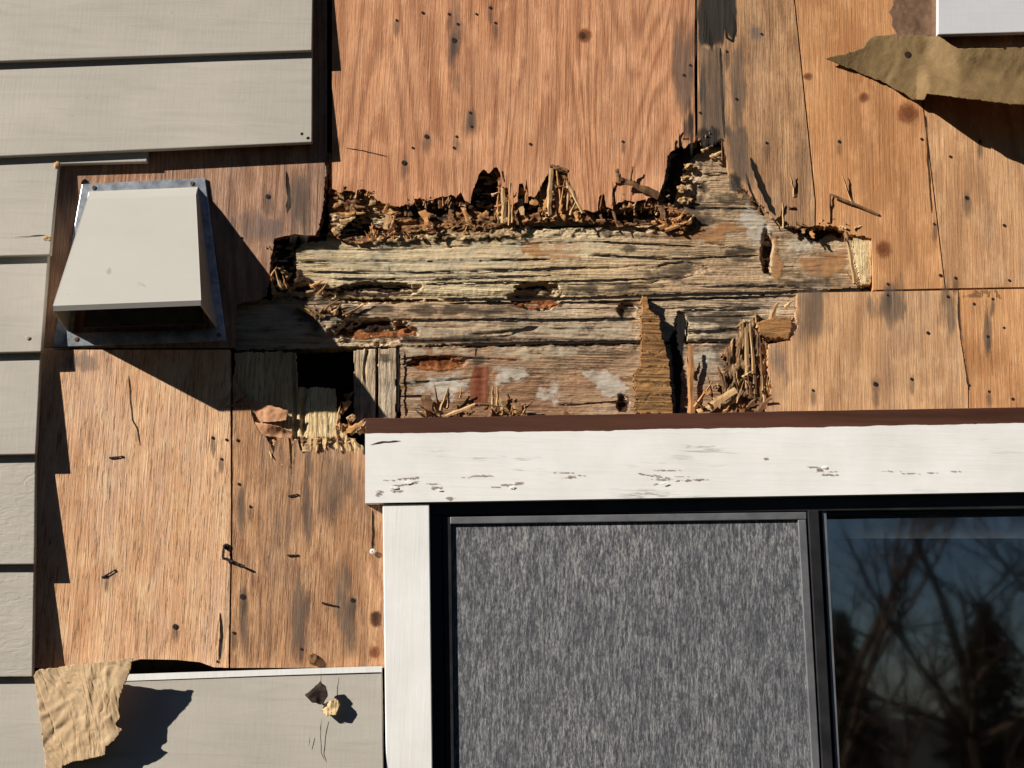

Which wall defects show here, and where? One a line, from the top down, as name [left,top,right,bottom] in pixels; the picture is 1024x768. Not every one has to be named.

peeling [338,180,467,231]
peeling [507,181,665,236]
peeling [668,223,746,242]
crack [128,375,140,444]
peeling [375,477,453,501]
peeling [638,470,708,486]